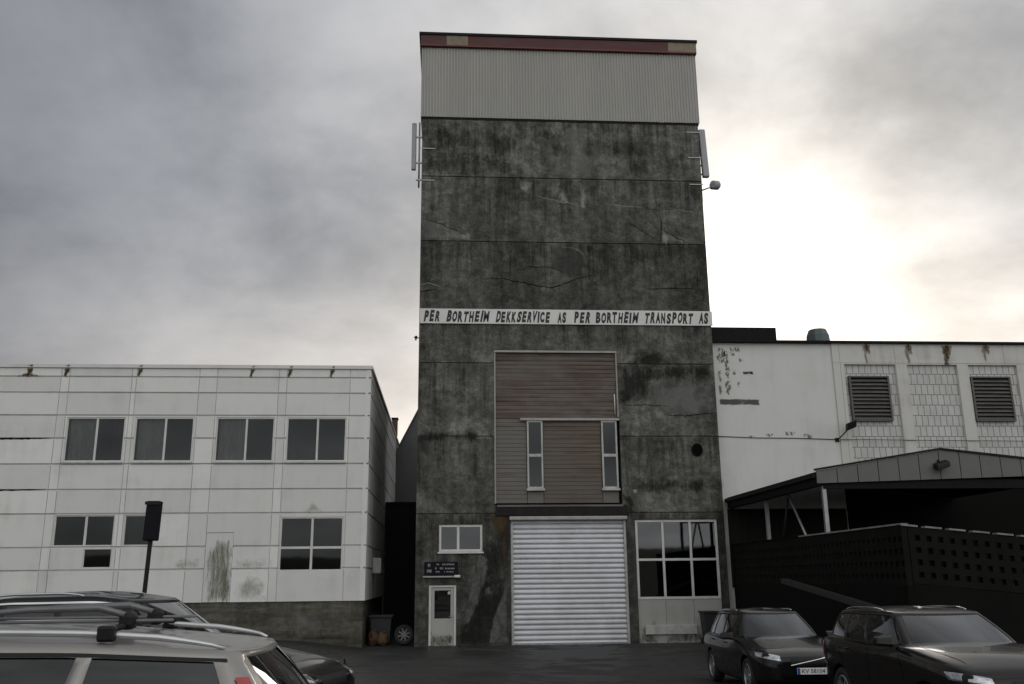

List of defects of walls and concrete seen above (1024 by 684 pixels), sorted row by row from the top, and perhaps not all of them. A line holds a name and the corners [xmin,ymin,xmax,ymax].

crack [604,203,694,245]
crack [488,266,588,288]
peeling [717,348,759,405]
crack [625,404,710,416]